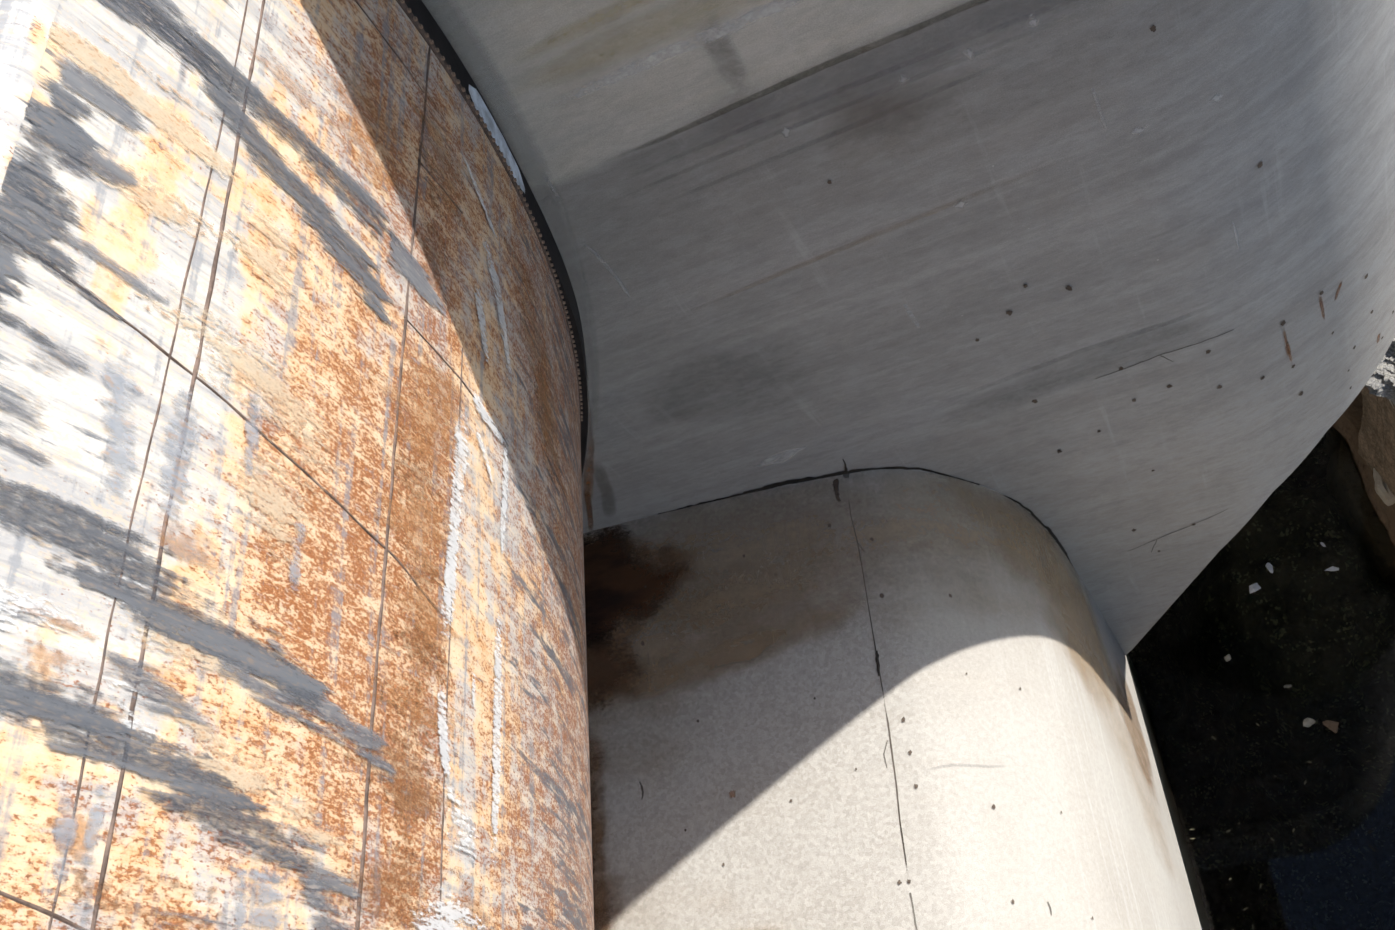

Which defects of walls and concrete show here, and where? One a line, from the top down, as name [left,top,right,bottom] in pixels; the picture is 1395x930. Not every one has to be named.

damp [589,482,1057,706]
corrosion [589,742,609,930]